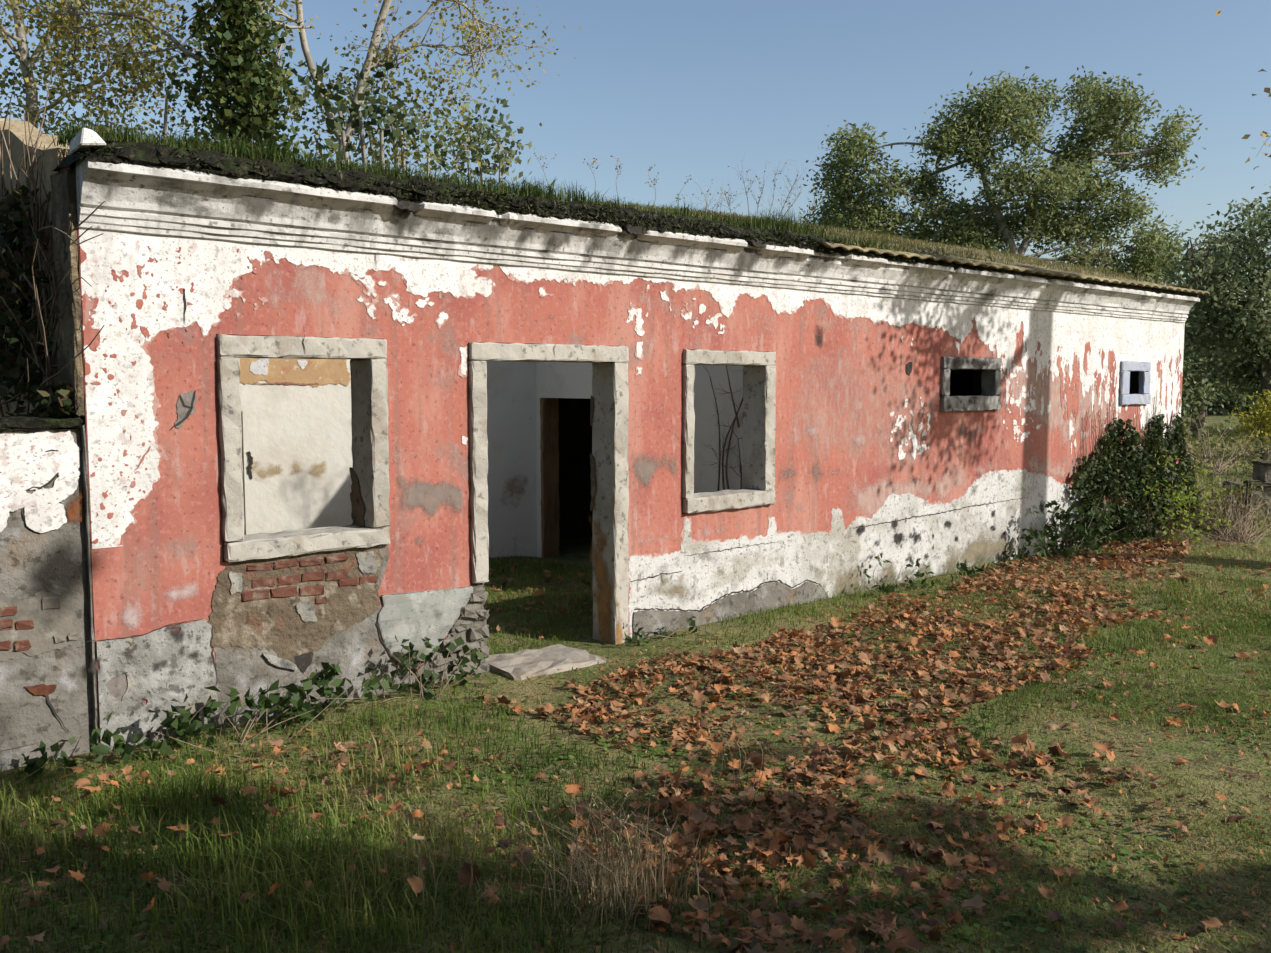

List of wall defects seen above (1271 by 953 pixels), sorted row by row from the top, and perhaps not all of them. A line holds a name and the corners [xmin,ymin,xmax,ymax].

peeling [0,228,1185,549]
flaking render [96,544,490,751]
peeling [628,468,1108,639]